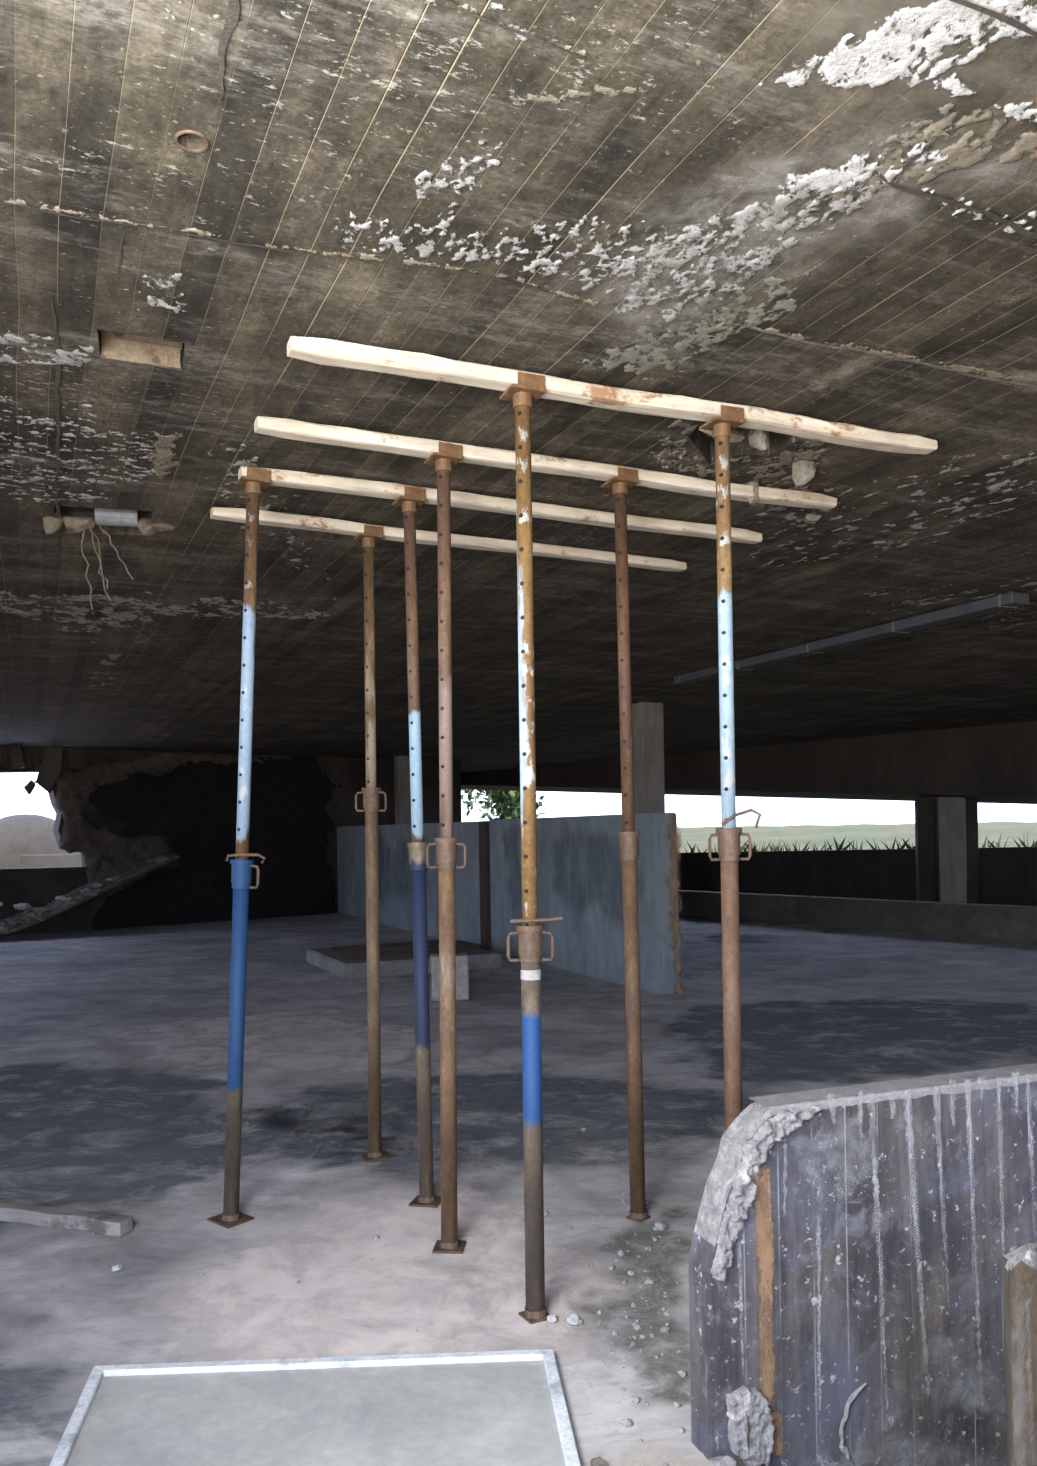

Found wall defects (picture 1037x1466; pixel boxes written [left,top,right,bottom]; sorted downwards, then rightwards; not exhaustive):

spalling [332,0,1037,381]
leakage [604,72,923,332]
leakage [955,158,1028,183]
spalling [55,752,295,898]
spalling [710,1105,823,1286]
rust [753,1167,784,1455]
leakage [935,1283,1025,1466]